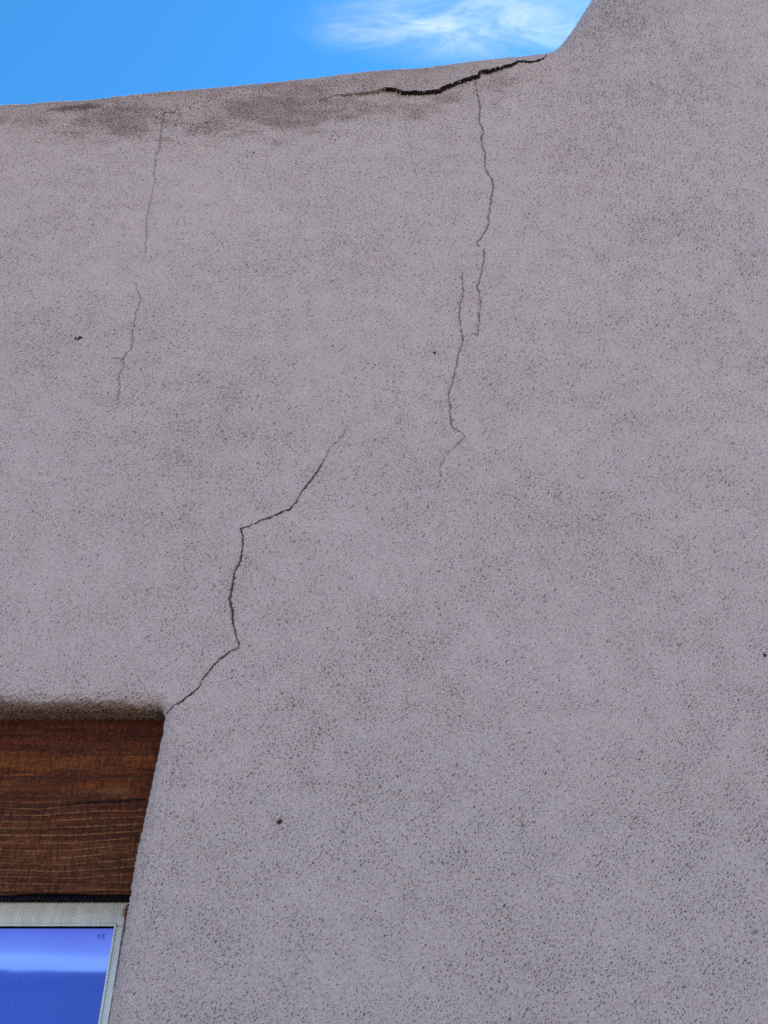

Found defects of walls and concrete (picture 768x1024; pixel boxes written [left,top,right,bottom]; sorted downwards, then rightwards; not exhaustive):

crack [383,54,547,95]
crack [167,455,327,714]